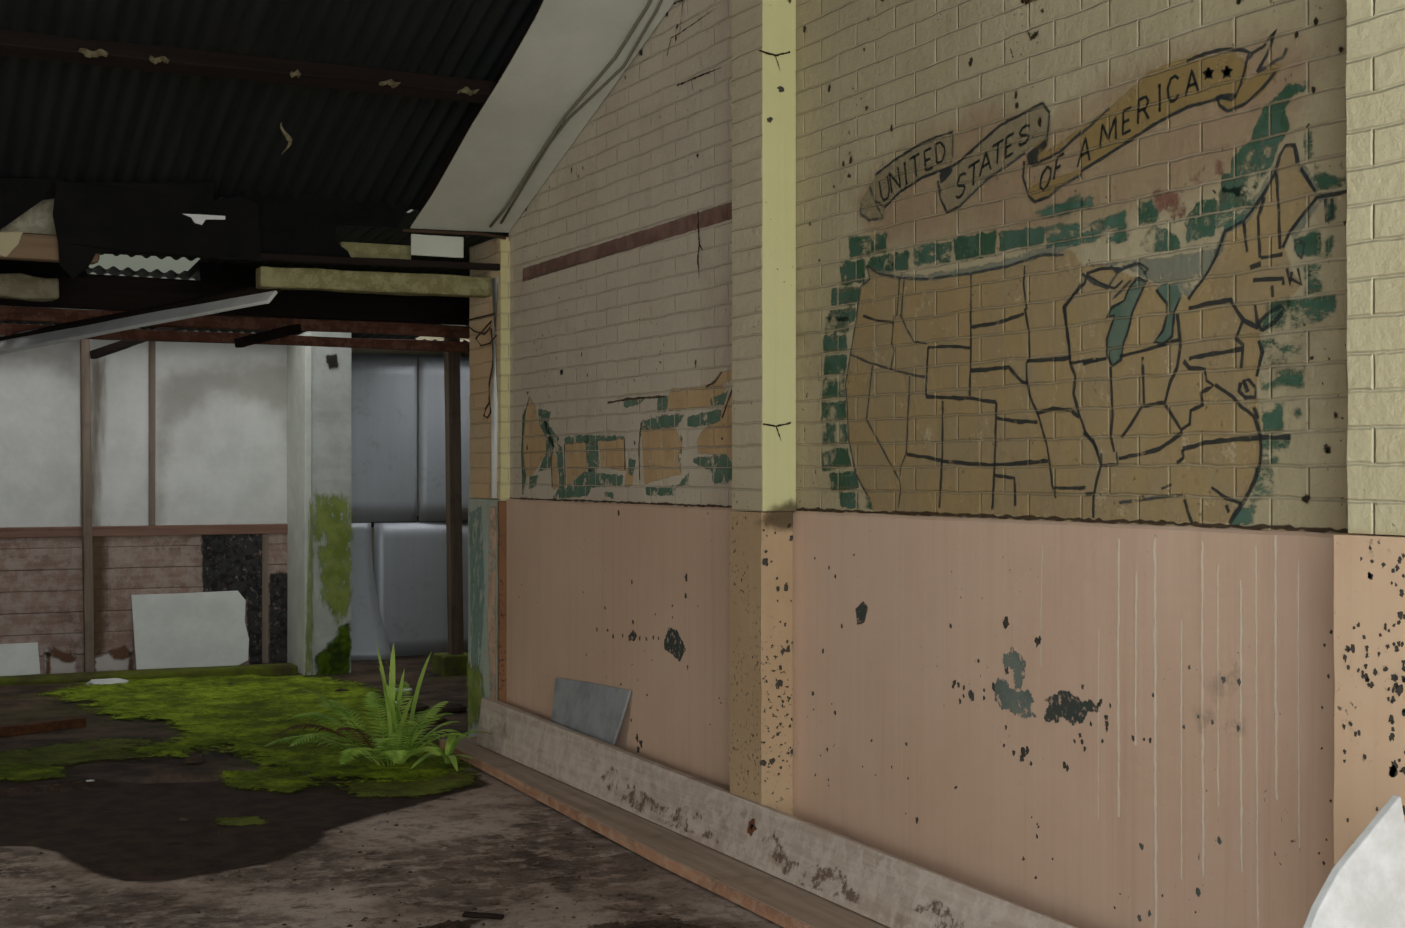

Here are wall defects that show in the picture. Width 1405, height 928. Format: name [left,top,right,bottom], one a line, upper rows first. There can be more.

peeling [0,232,23,257]
peeling [596,573,698,669]
peeling [952,648,1111,766]
water stain [1117,539,1158,928]
water stain [1180,535,1278,928]